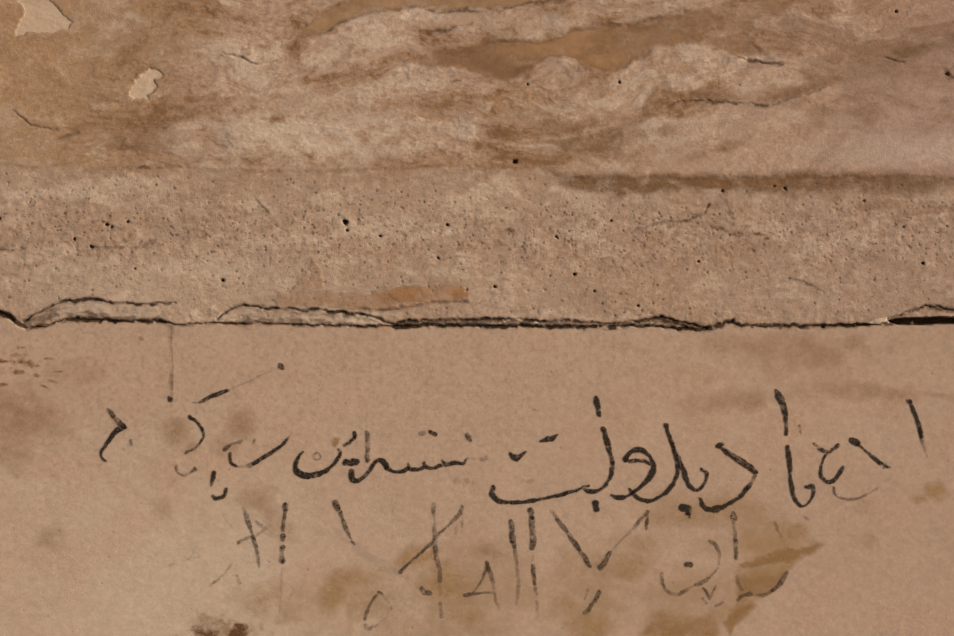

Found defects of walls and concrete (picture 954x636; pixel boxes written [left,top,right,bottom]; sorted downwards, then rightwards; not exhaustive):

peeling [15,0,73,36]
peeling [302,0,547,35]
peeling [424,11,741,80]
peeling [129,68,163,100]
crack [0,297,166,328]
crack [229,304,954,332]
leakage [198,620,248,636]